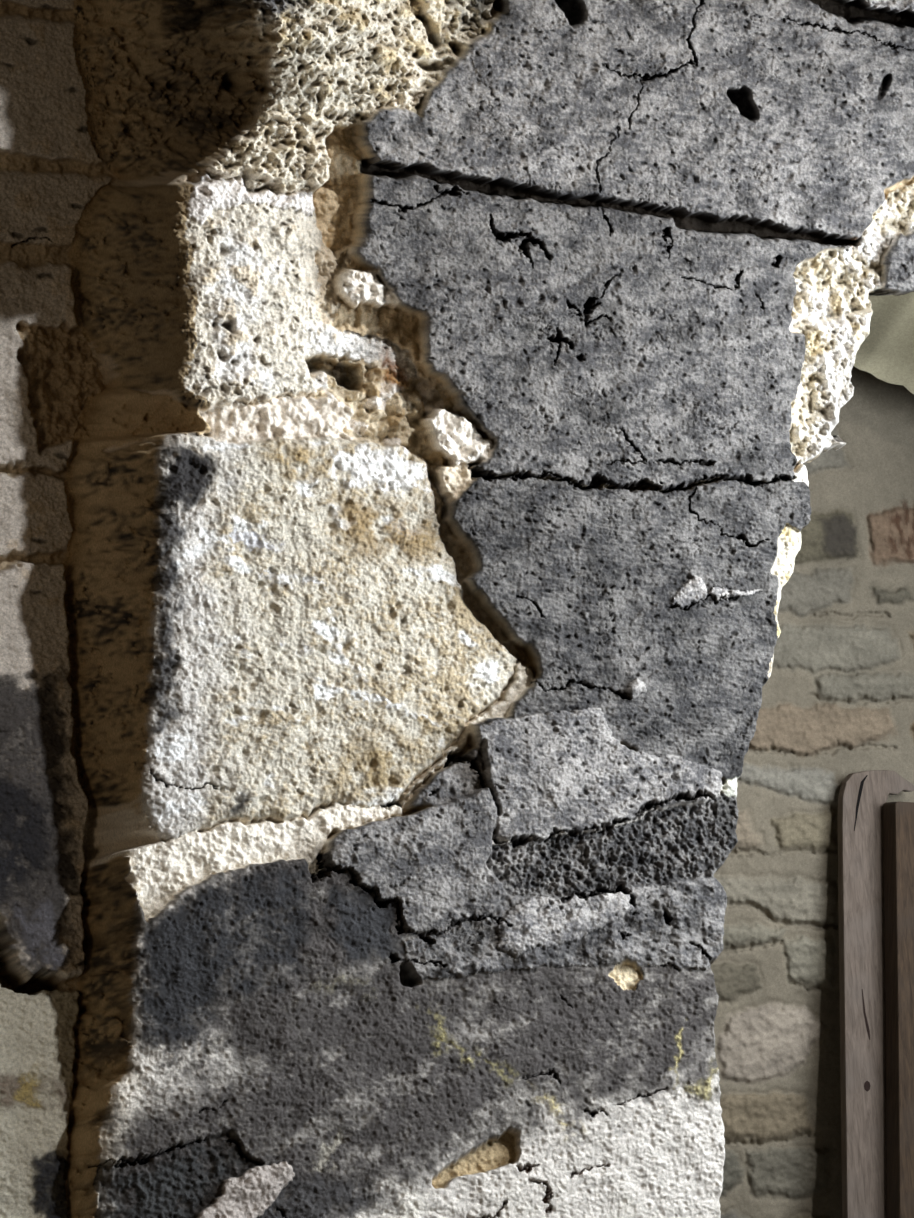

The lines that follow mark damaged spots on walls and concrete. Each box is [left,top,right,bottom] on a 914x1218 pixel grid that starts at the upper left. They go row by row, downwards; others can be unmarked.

crack [781,18,914,52]
crack [595,0,705,237]
spalling [305,354,465,519]
crack [468,428,796,548]
crack [492,790,716,848]
damp [140,867,310,1054]
damp [329,886,400,960]
crack [318,852,513,968]
crack [561,886,673,940]
damp [685,1067,718,1100]
damp [113,1146,237,1218]
damp [263,1131,377,1218]